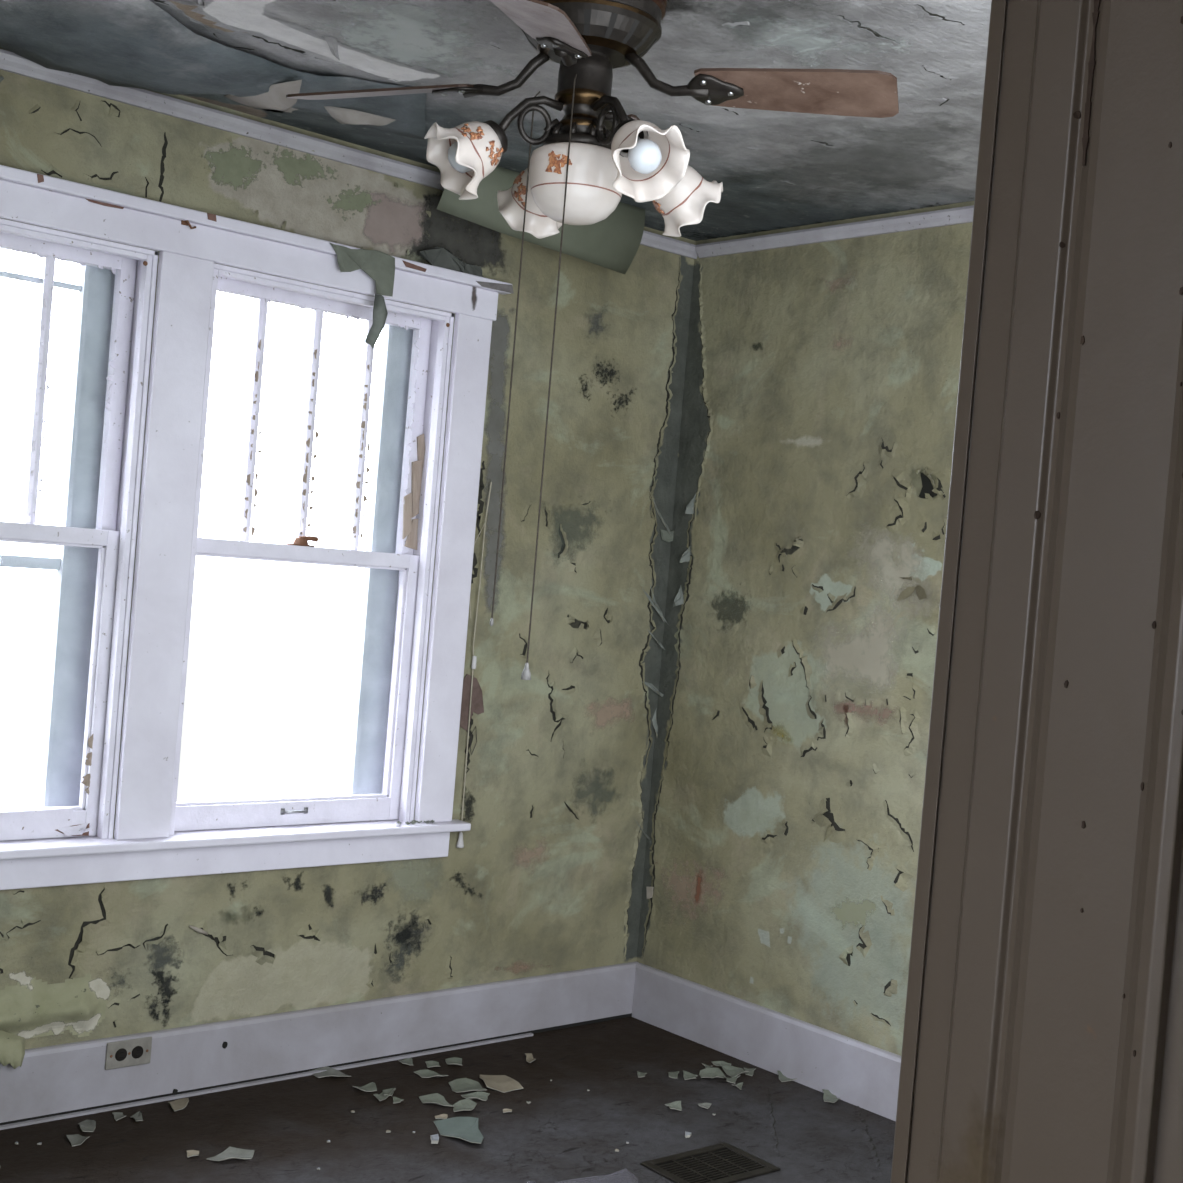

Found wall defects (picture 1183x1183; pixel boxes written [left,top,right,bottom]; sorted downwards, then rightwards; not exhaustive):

damp [325,4,479,70]
crack [29,100,168,202]
damp [410,193,504,271]
crack [519,608,613,759]
peeling [618,253,716,965]
peeling [736,631,840,760]
crack [711,543,936,778]
mould [148,938,178,1024]
crack [68,886,276,979]
damp [387,915,429,980]
peeling [711,774,920,1056]
crack [761,764,914,966]